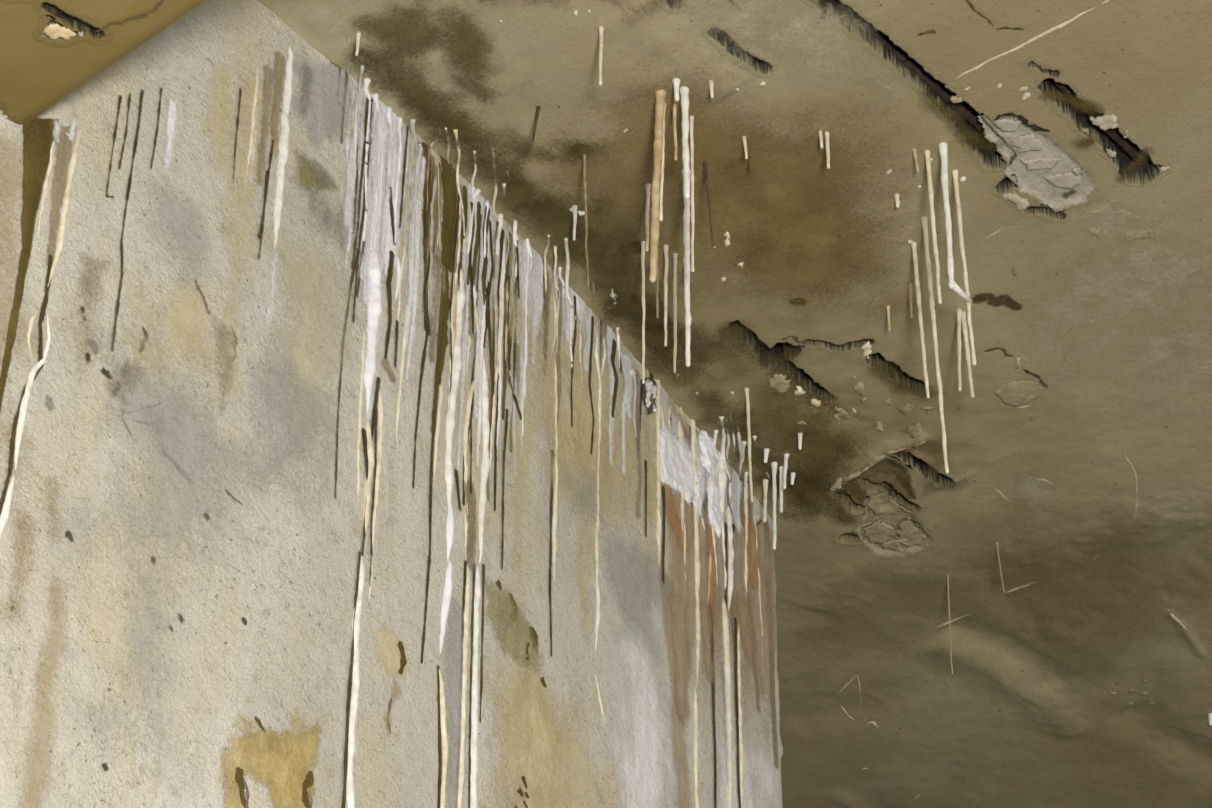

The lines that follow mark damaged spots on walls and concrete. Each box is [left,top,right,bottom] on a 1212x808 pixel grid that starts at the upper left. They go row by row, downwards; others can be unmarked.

leakage [106,89,143,351]
leakage [150,88,177,170]
leakage [212,47,348,432]
leakage [354,9,896,808]
spalling [647,0,691,15]
spalling [700,22,780,79]
crack [780,335,881,358]
spalling [716,317,962,561]
leakage [948,280,972,303]
spalling [800,0,1173,224]
leakage [342,330,384,808]
corrosion [662,483,776,722]